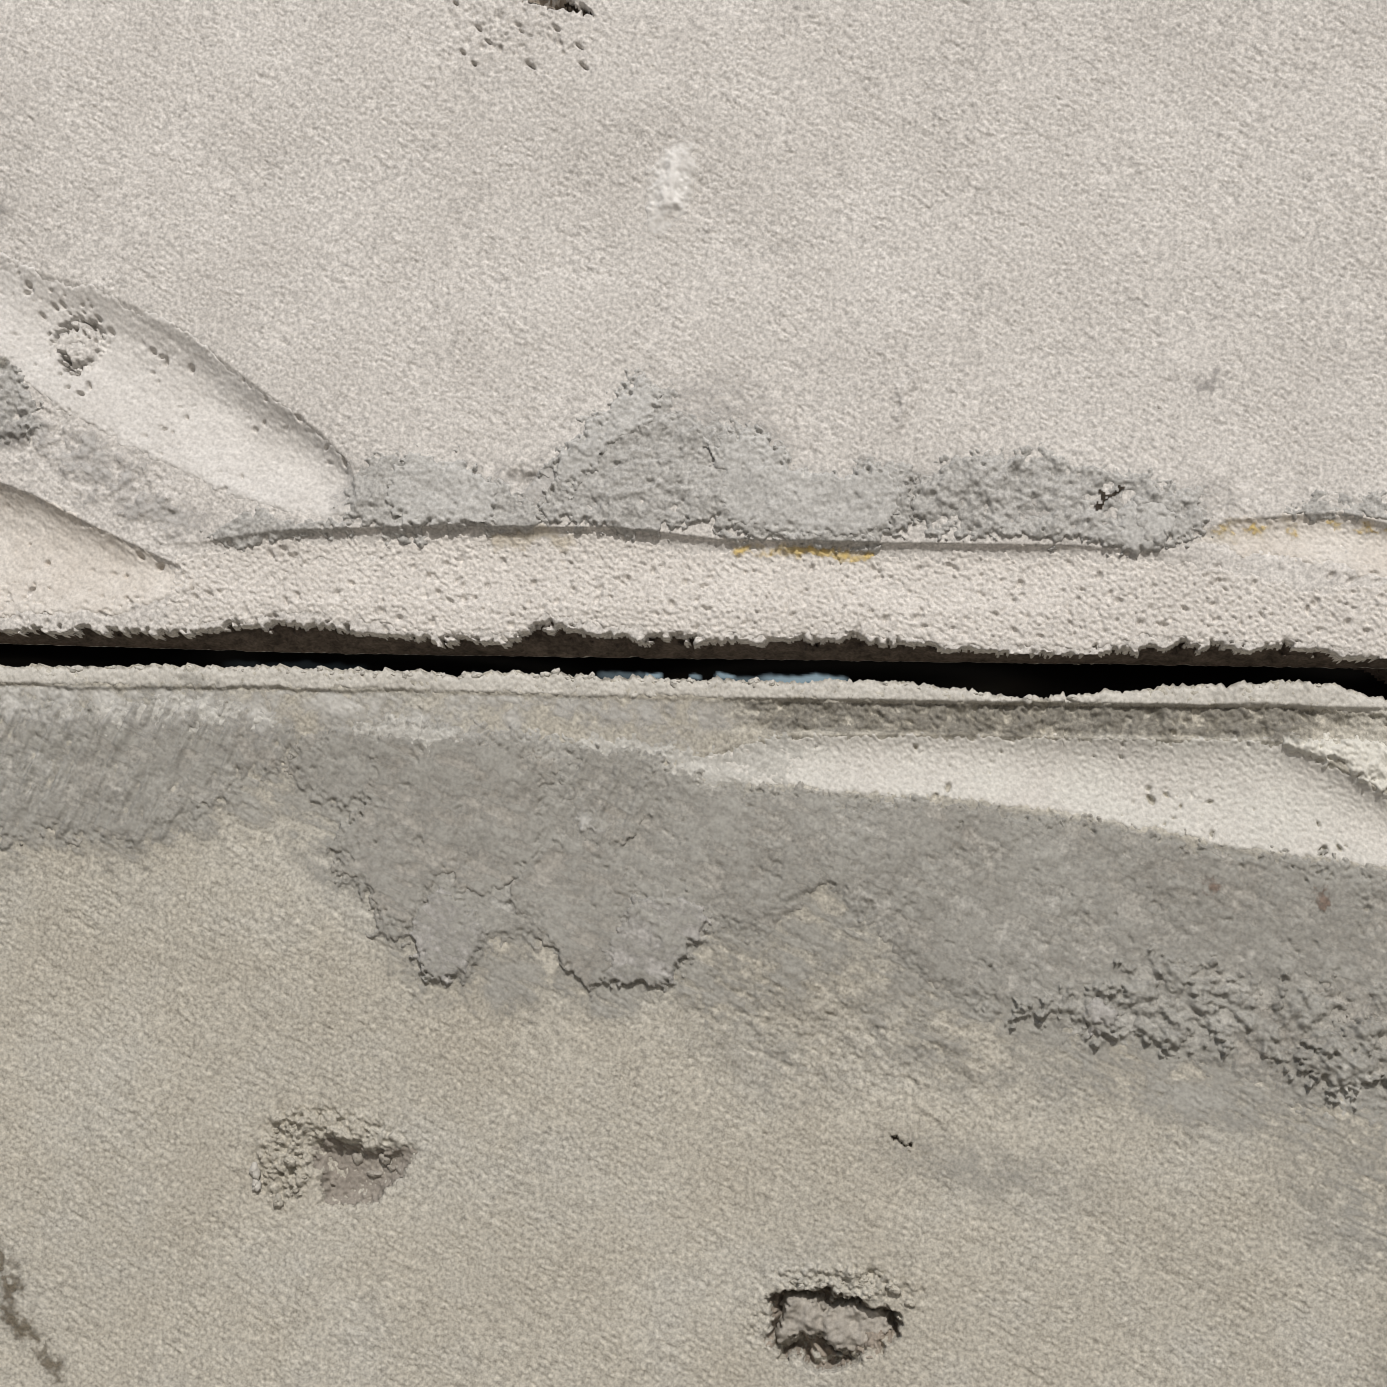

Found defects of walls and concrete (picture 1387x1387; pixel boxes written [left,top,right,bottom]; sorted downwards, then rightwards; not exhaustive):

spalling [522,0,592,16]
peeling [553,369,665,500]
spalling [165,426,1387,669]
crack [0,644,1387,700]
spalling [0,663,1387,716]
spalling [1275,731,1387,793]
peeling [342,735,659,986]
peeling [602,889,713,992]
peeling [1082,996,1120,1039]
spalling [249,1124,418,1208]
spalling [762,1275,916,1370]